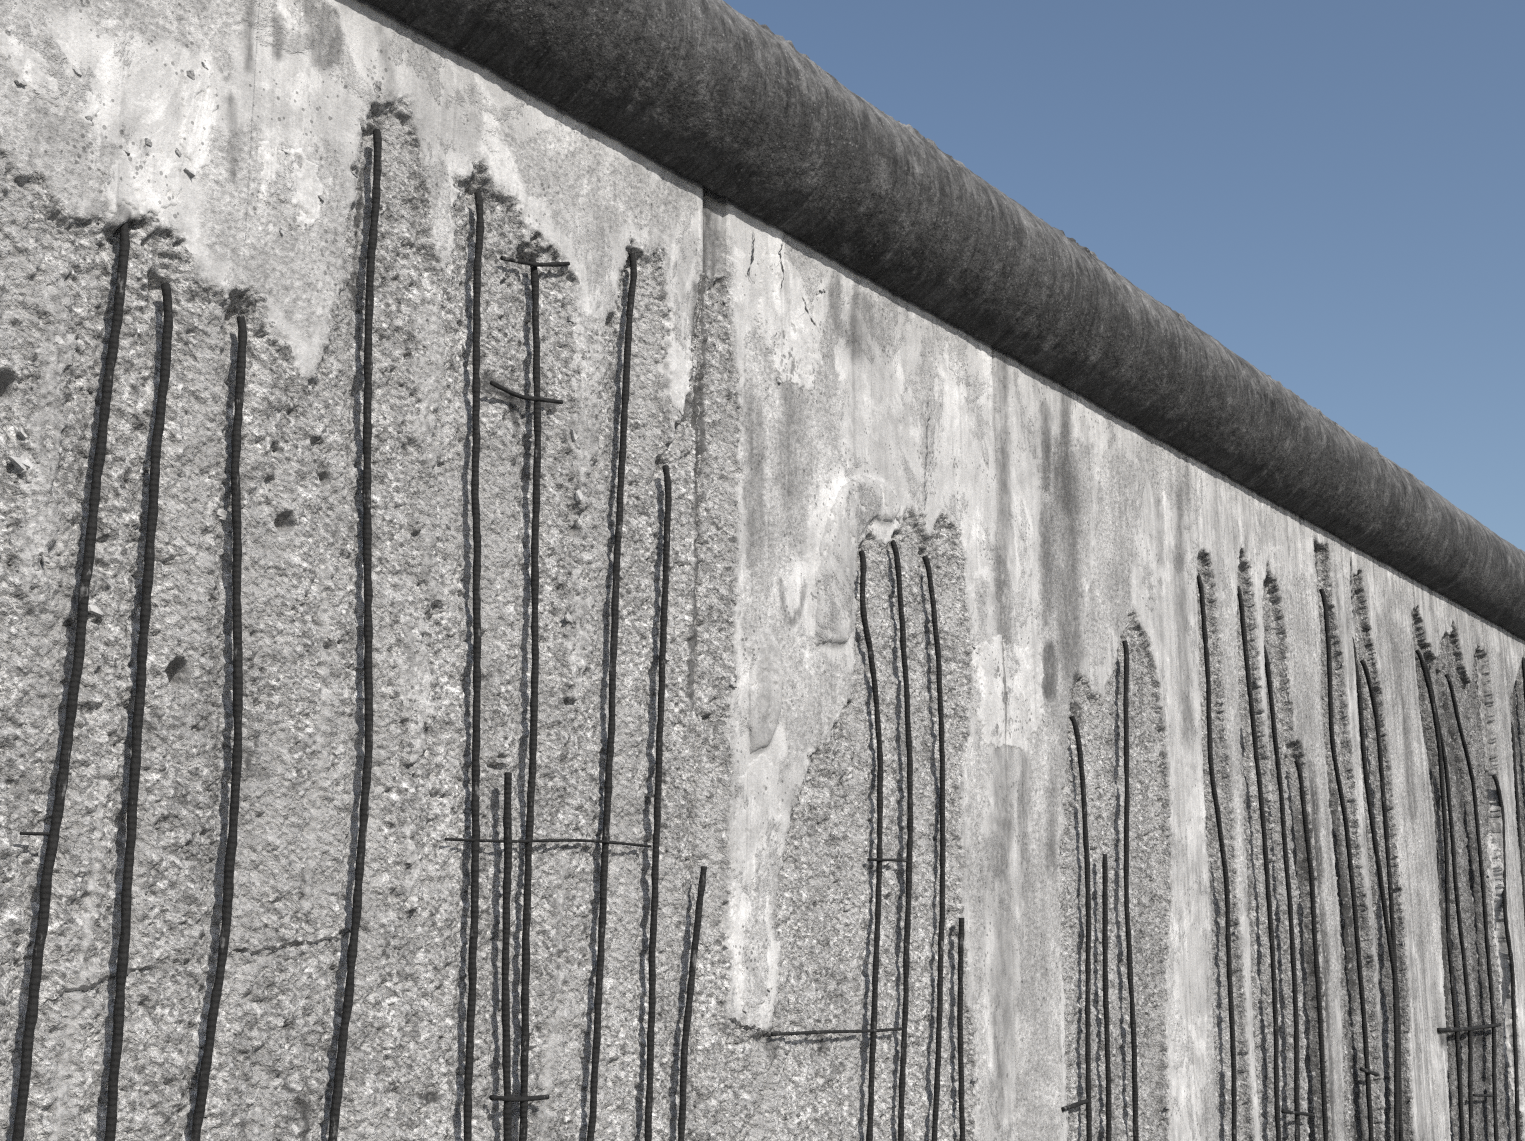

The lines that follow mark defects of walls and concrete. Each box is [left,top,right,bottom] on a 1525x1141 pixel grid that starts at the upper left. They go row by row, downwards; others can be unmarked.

peeling [0,19,99,126]
spalling [0,62,1046,1141]
spalling [1057,610,1172,1141]
spalling [1196,537,1414,1141]
spalling [1411,608,1525,1141]